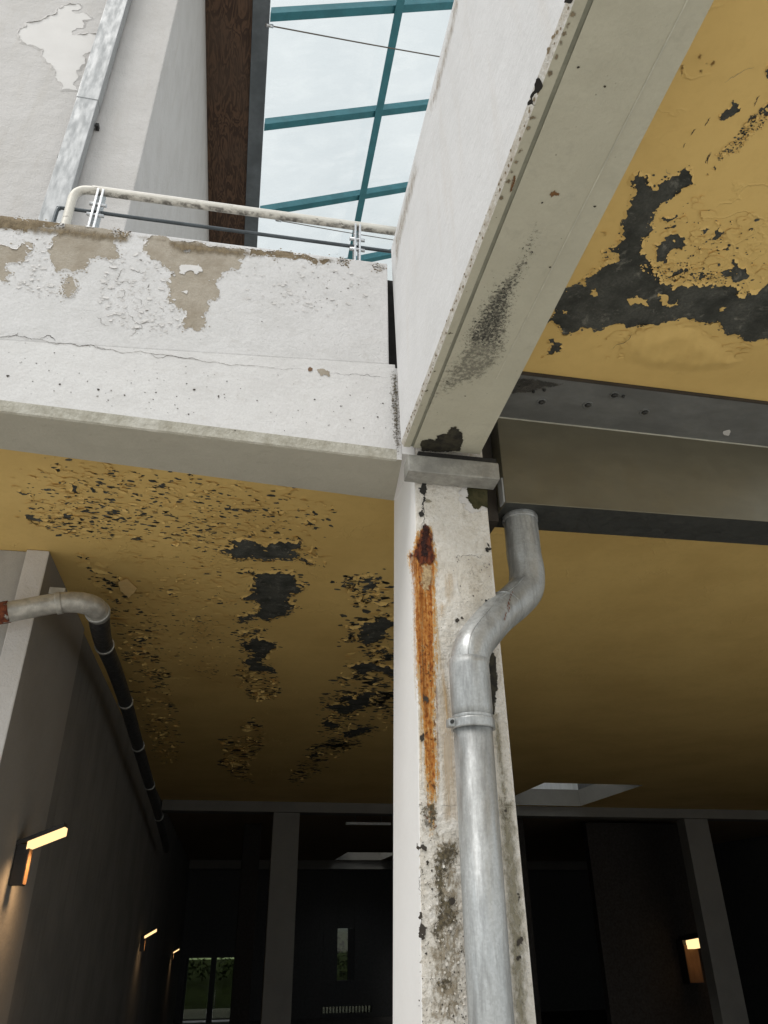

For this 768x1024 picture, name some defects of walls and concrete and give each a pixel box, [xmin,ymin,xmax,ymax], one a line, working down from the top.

peeling [16,3,96,92]
peeling [0,216,131,302]
crack [3,268,299,370]
water stain [444,234,533,388]
peeling [541,100,768,359]
peeling [10,459,337,702]
peeling [288,569,394,783]
corrosion [407,524,447,830]
water stain [419,802,465,1019]